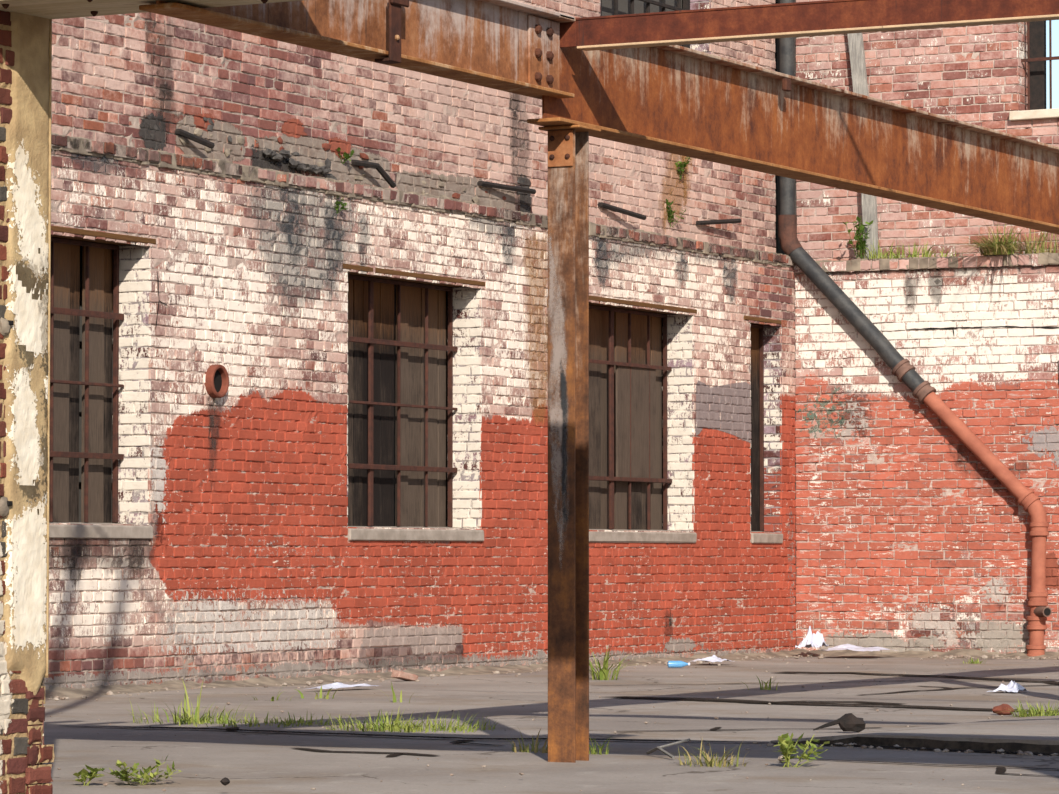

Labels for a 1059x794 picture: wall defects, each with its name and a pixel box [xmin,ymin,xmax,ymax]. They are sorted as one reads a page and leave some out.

peeling [0,12,52,794]
peeling [1022,419,1059,468]
peeling [148,440,169,528]
peeling [151,578,347,655]
peeling [360,624,464,655]